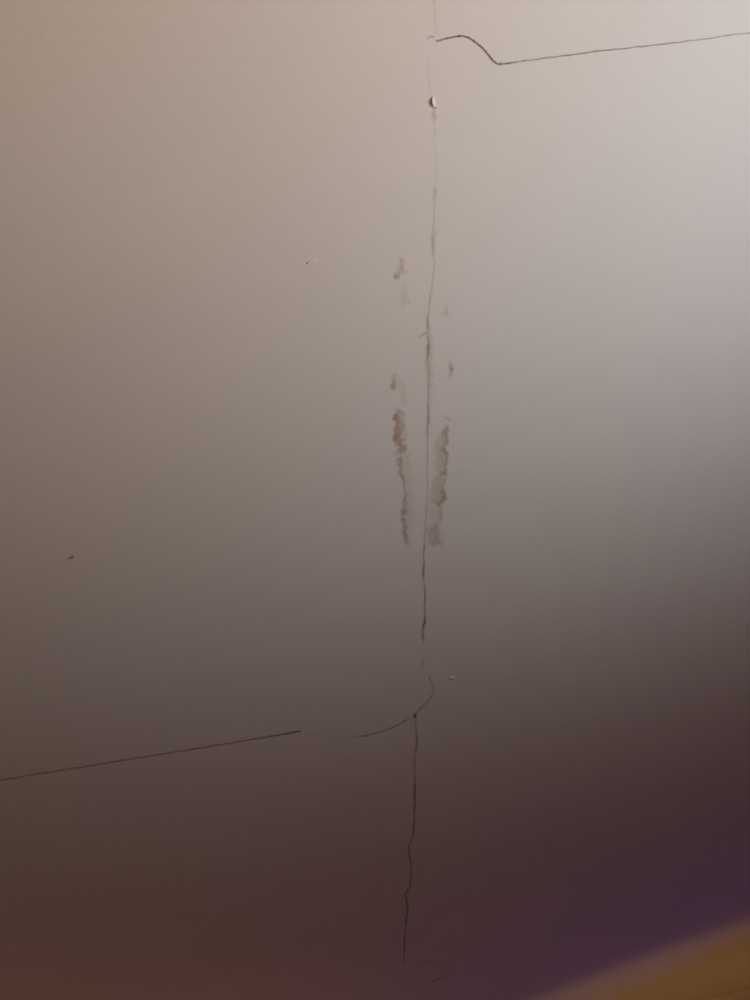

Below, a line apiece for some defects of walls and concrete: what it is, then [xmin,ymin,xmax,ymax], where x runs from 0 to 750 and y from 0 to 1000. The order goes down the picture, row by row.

crack [440,35,514,65]